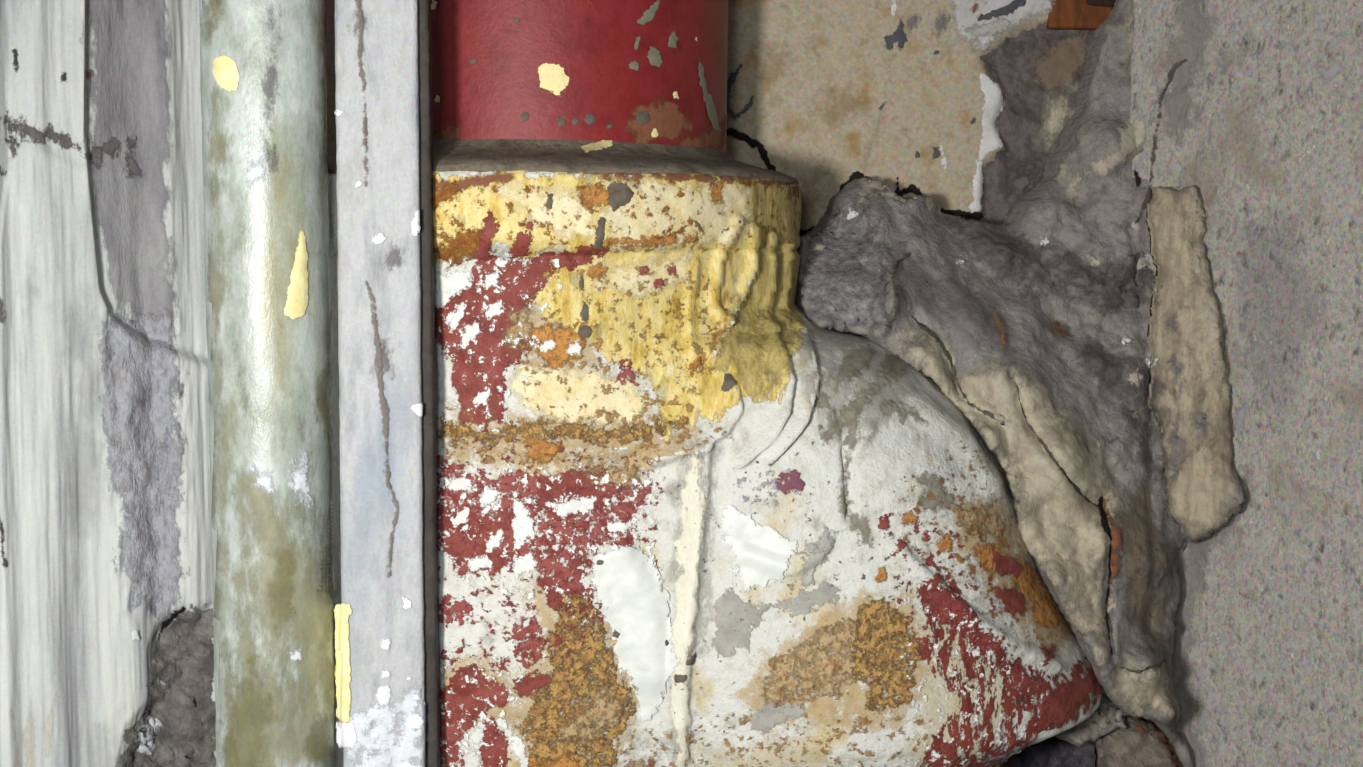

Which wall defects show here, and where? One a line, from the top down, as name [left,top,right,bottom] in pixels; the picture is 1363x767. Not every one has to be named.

crack [726,127,776,171]
crack [799,171,984,236]
flaking render [0,0,216,767]
leakage [222,658,271,767]
leakage [269,552,293,617]
peeling [435,181,635,433]
peeling [437,455,696,767]
rust [442,567,1020,767]
peeling [720,505,798,593]
rust [901,437,1078,657]
peeling [923,543,1104,733]
crack [883,252,1166,674]